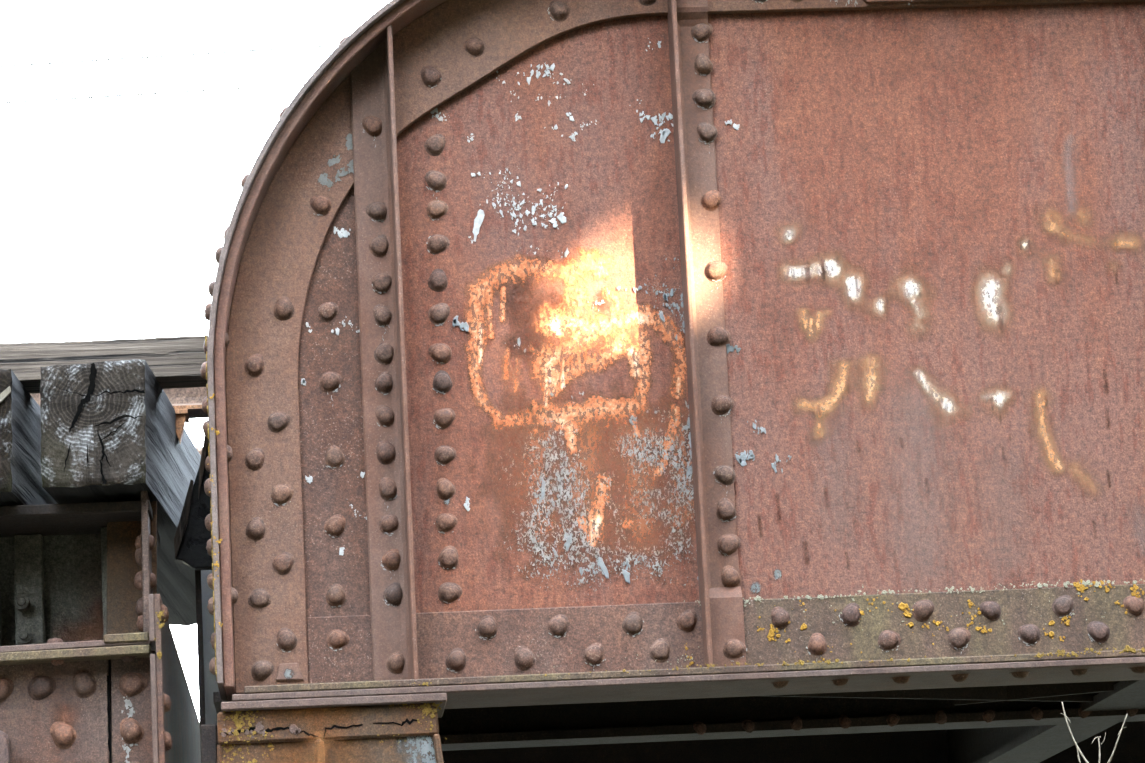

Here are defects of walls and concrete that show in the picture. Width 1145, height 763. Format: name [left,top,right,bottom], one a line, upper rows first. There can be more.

peeling [496,62,571,121]
peeling [544,112,597,142]
peeling [636,99,673,143]
peeling [468,168,568,243]
peeling [588,275,685,351]
rust [784,252,922,317]
rust [978,268,1010,328]
rust [464,248,695,566]
rust [798,361,849,435]
rust [916,370,959,420]
rust [986,390,1015,418]
peeling [498,401,698,599]